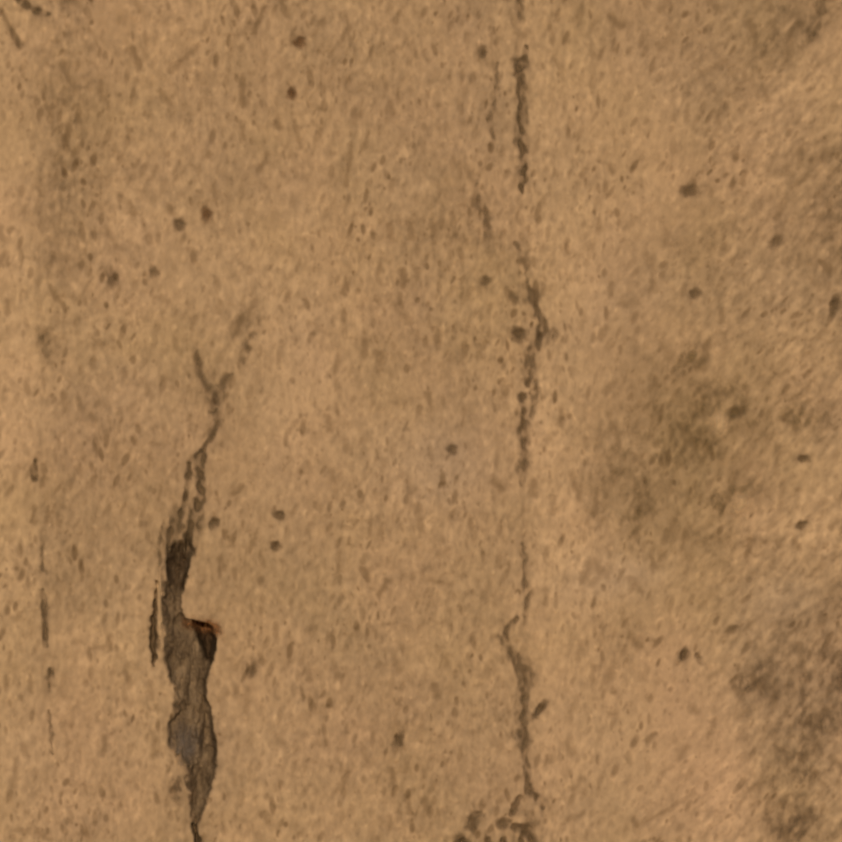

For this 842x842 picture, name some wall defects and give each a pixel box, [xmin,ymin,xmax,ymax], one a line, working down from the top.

crack [515,45,528,194]
crack [525,286,546,386]
crack [166,408,219,555]
crack [517,408,526,470]
crack [149,600,158,666]
crack [501,617,544,809]
crack [192,823,202,842]